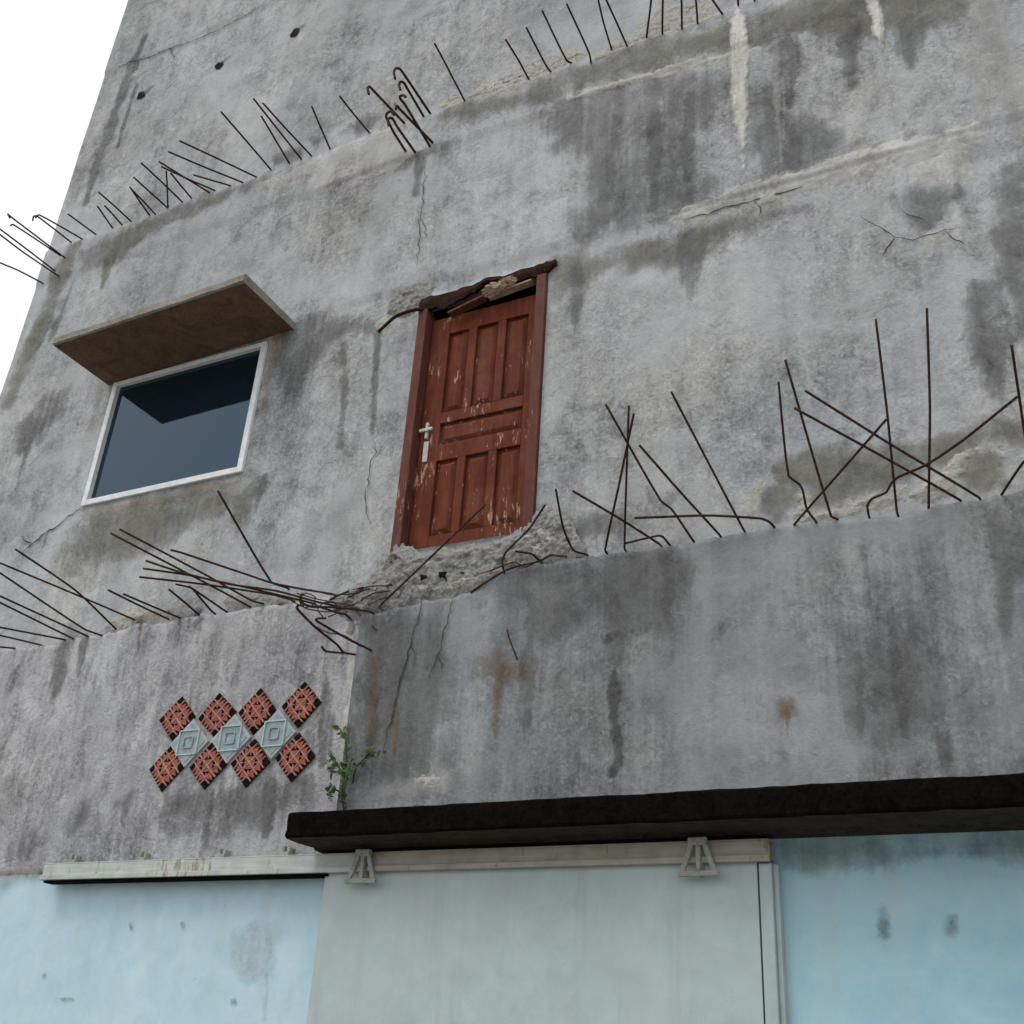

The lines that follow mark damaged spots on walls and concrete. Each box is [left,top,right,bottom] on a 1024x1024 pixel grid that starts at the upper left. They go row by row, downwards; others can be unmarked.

crack [416,171,427,261]
crack [683,186,802,220]
water stain [547,0,991,323]
crack [863,211,964,254]
spalling [374,281,436,336]
spalling [0,489,590,656]
crack [383,595,453,749]
water stain [608,672,623,777]